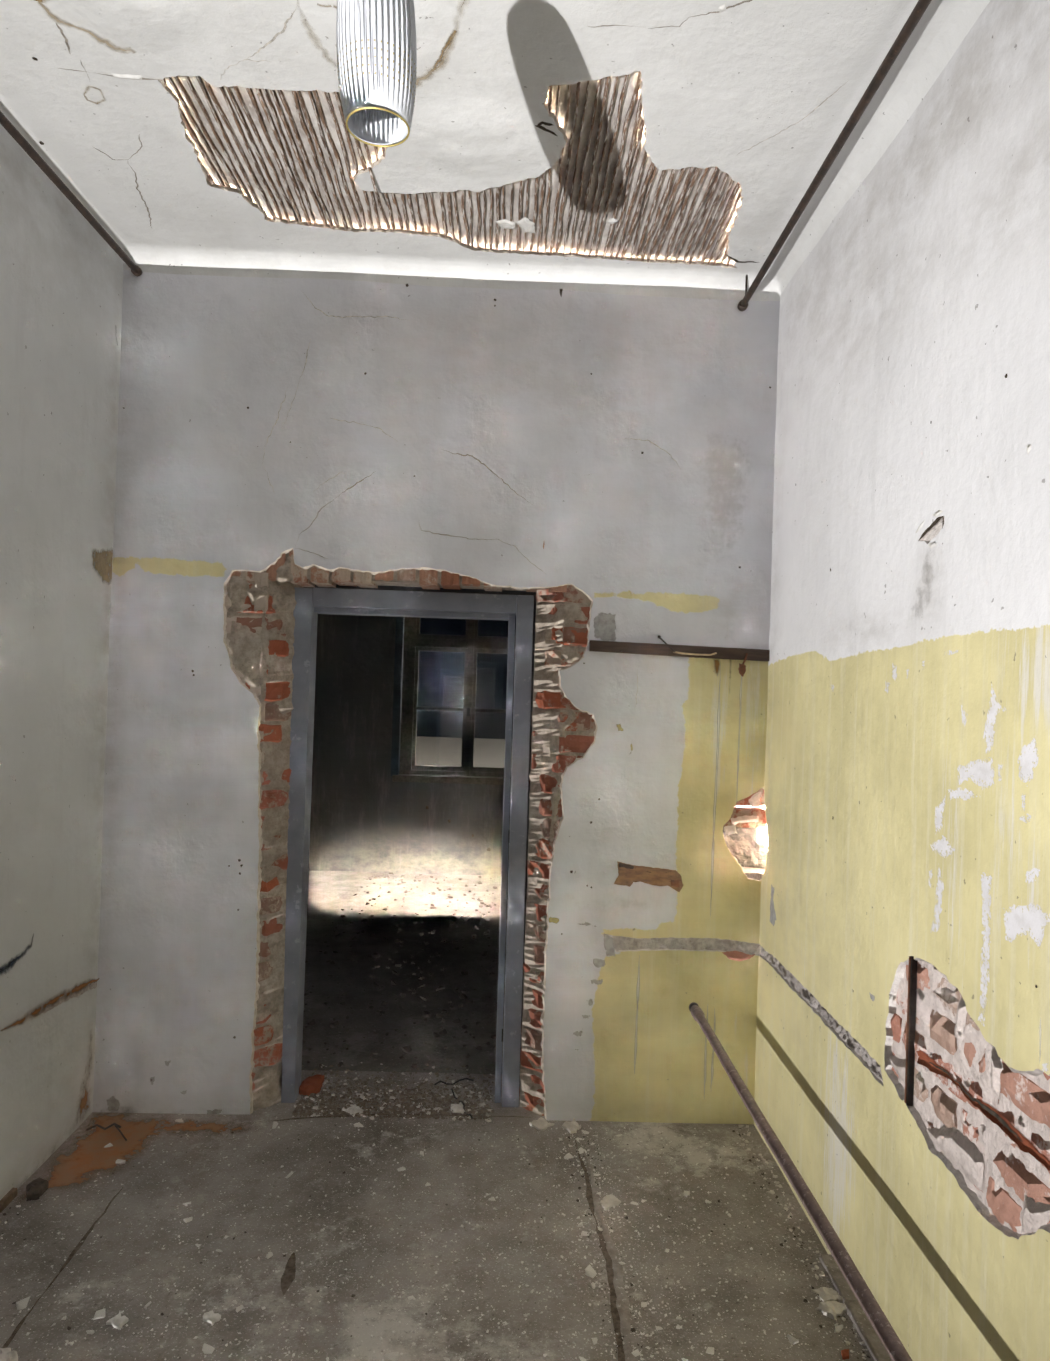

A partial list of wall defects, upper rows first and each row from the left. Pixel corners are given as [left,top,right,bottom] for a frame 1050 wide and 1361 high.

leakage [34,0,125,51]
crack [220,6,297,80]
leakage [416,30,457,85]
crack [588,0,752,29]
spalling [158,71,759,268]
crack [295,471,376,559]
crack [442,449,533,505]
spalling [223,548,616,1119]
spalling [723,787,776,926]
peeling [929,684,1040,932]
spalling [870,872,1050,1239]
corrosion [47,1082,243,1189]